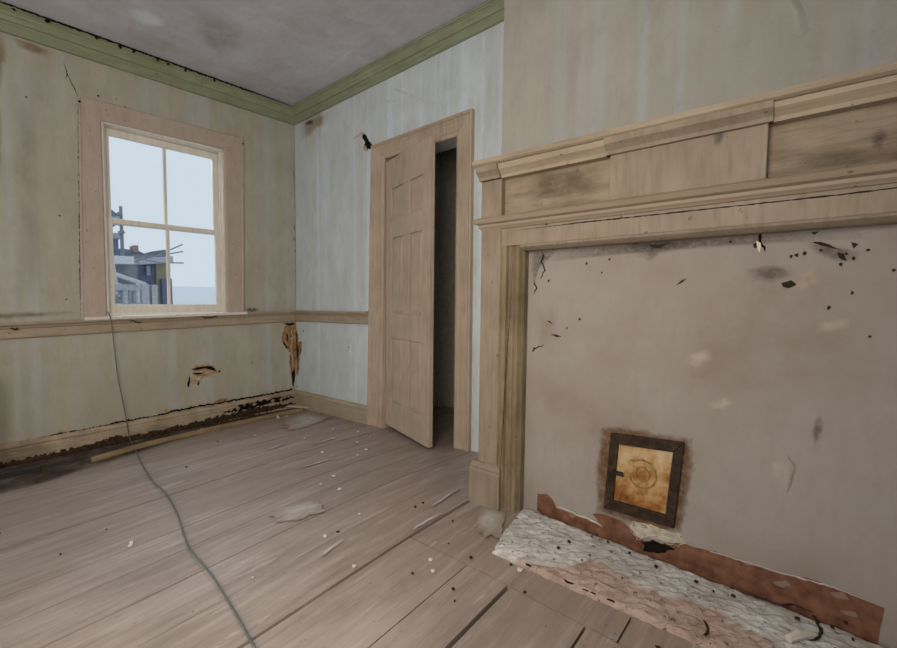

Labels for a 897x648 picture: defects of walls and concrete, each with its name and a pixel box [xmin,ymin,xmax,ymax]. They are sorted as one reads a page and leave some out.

spalling [187,362,222,387]
spalling [281,321,304,388]
peeling [537,493,885,645]